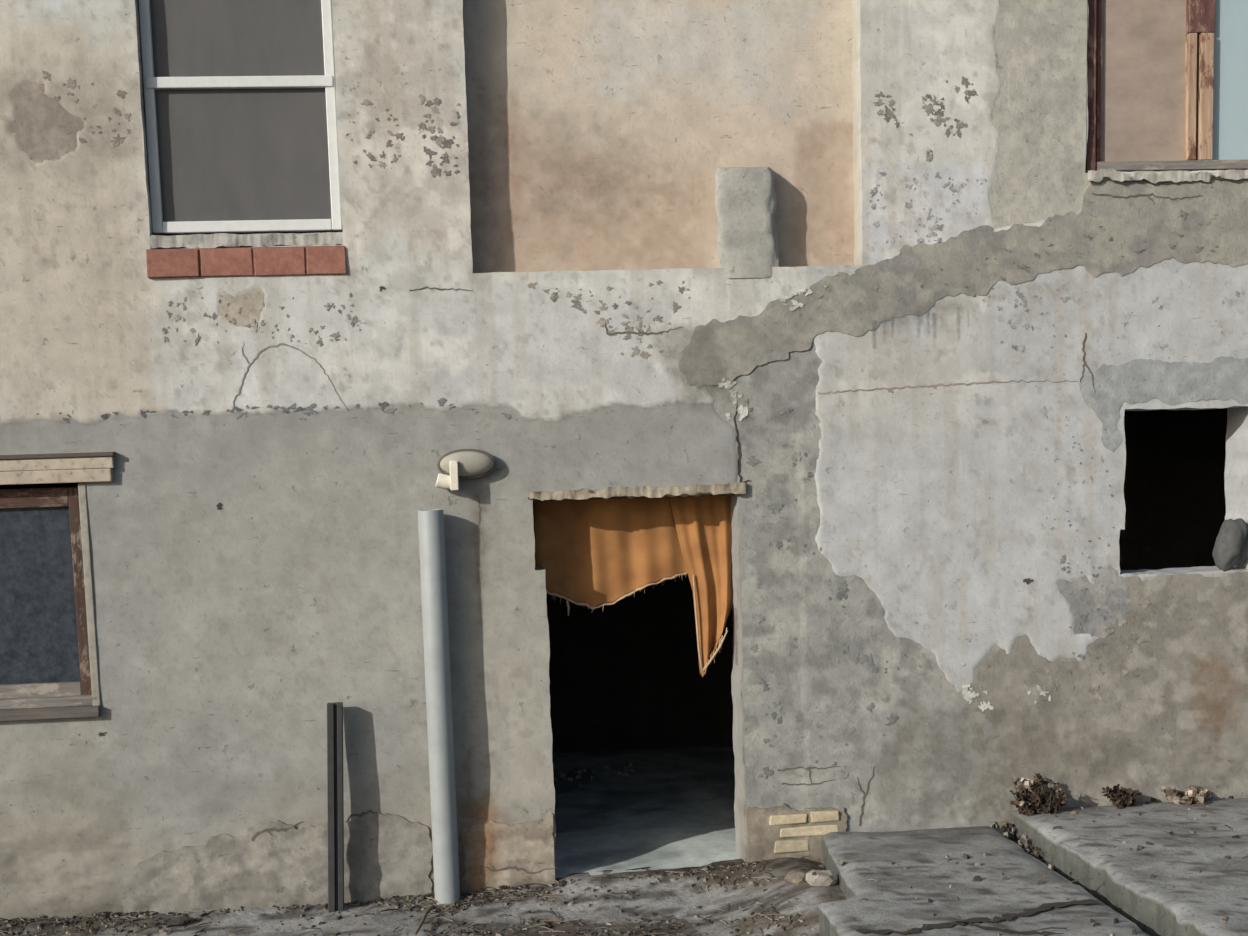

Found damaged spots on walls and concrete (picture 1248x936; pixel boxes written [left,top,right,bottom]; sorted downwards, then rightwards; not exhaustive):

peeling [8,70,131,163]
peeling [346,99,405,168]
peeling [418,94,460,178]
peeling [873,91,912,136]
flaking render [886,0,1092,244]
peeling [869,172,887,227]
peeling [527,280,690,359]
peeling [784,285,827,311]
peeling [965,276,1067,348]
crack [230,341,347,412]
crack [734,406,752,483]
flaking render [705,341,1248,863]